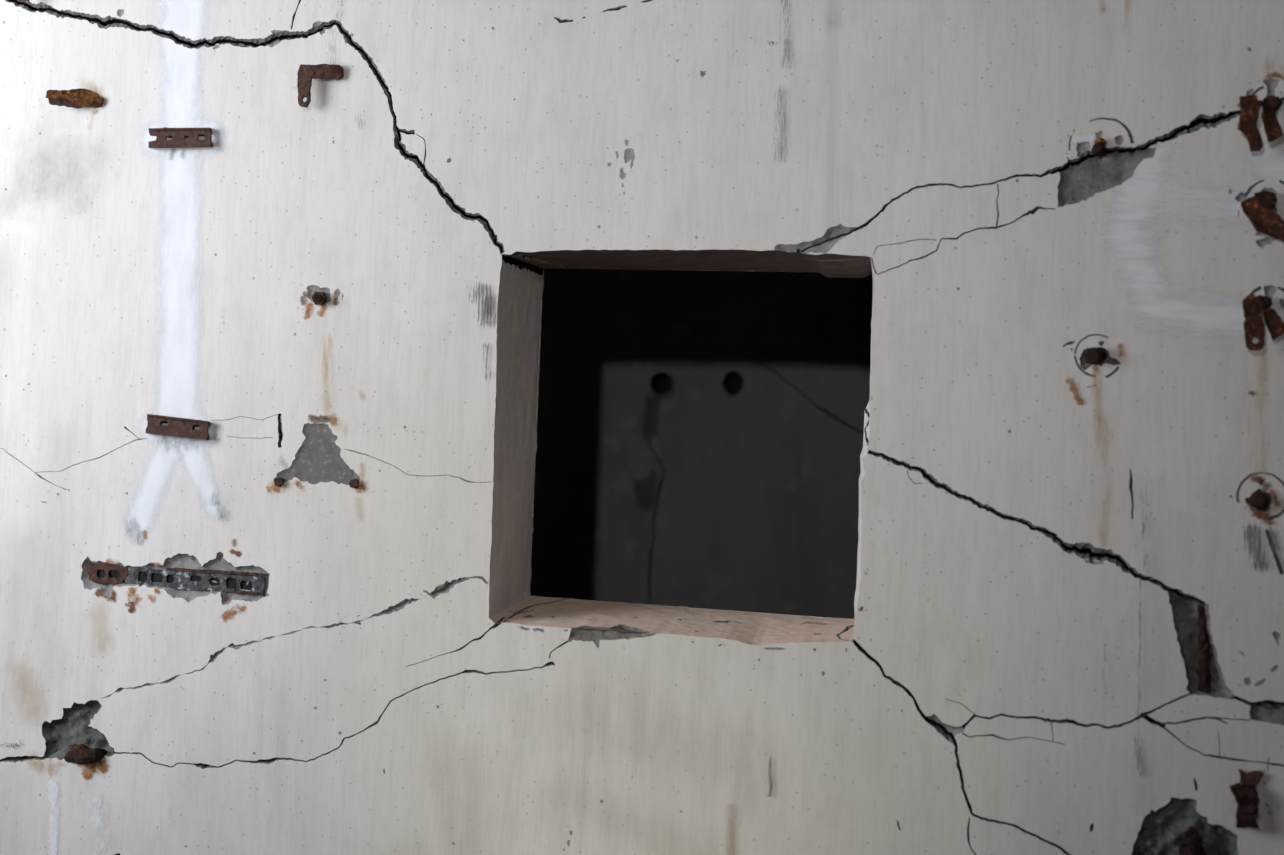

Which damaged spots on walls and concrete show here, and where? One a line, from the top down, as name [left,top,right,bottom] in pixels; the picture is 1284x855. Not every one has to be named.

crack [5,0,569,276]
crack [796,97,1284,275]
damp [126,0,223,536]
peeling [274,416,360,485]
crack [0,755,47,763]
spalling [42,700,114,765]
spalling [81,552,270,605]
crack [101,576,489,699]
crack [116,598,568,769]
crack [836,625,1284,855]
spalling [1131,778,1239,855]
spalling [1168,591,1279,699]